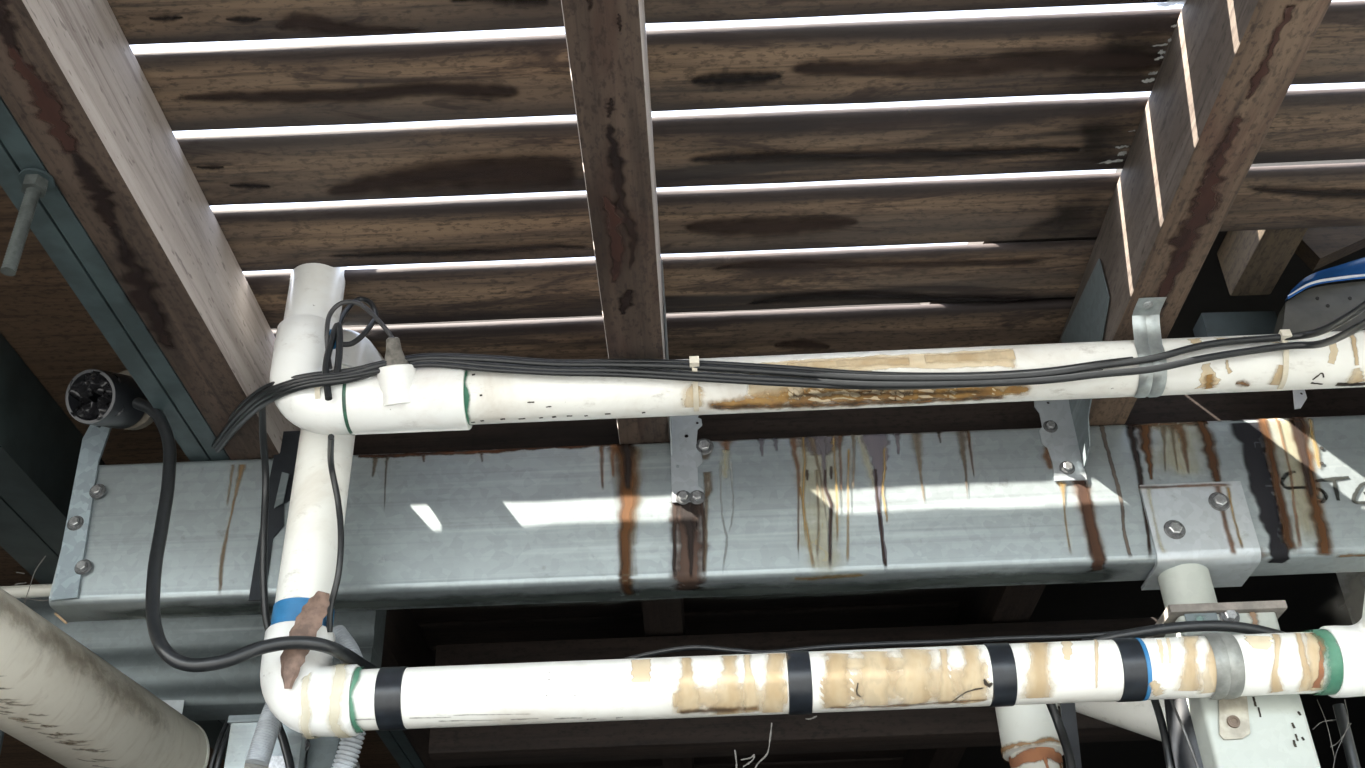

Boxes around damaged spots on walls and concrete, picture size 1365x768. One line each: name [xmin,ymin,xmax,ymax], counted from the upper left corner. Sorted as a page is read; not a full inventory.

leakage [0,0,20,53]
leakage [71,153,174,348]
leakage [1252,187,1365,199]
corrosion [358,443,645,595]
corrosion [669,440,734,590]
corrosion [1058,480,1106,571]
corrosion [1258,417,1365,557]